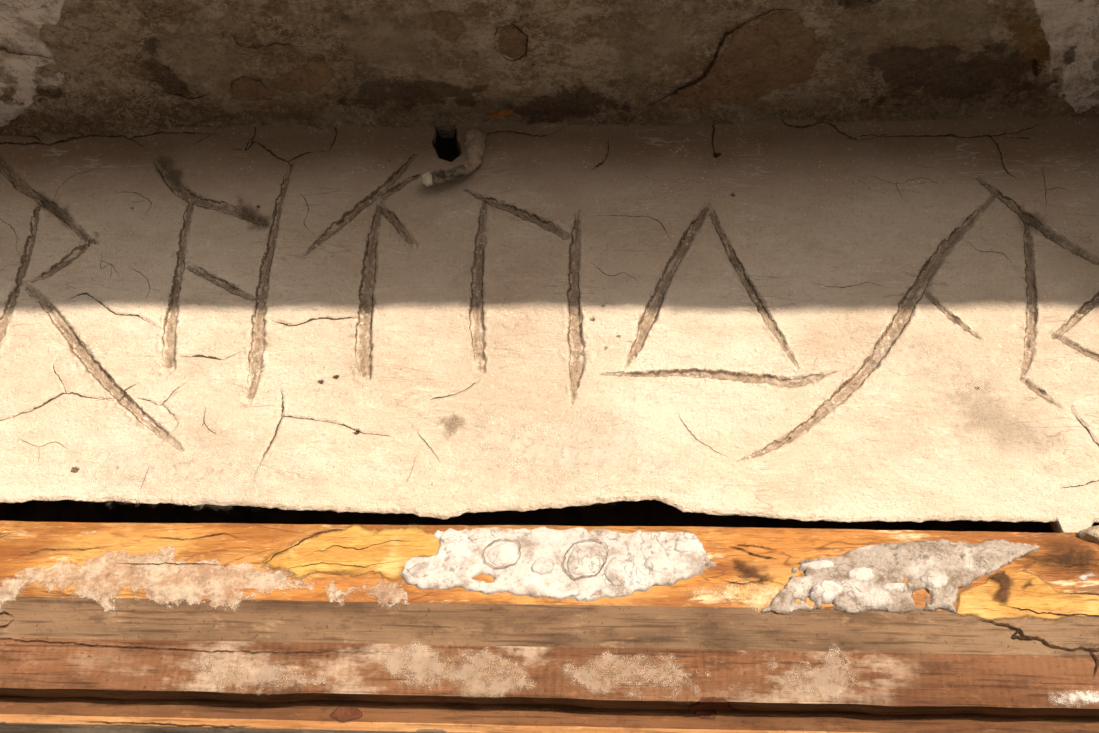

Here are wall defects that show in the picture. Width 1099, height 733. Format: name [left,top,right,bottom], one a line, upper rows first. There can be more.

crack [0,47,60,62]
peeling [0,0,71,127]
crack [652,9,792,105]
peeling [1034,0,1099,113]
crack [0,128,218,152]
crack [782,119,1047,178]
crack [69,252,158,328]
crack [272,317,352,326]
crack [0,349,244,461]
crack [253,391,386,477]
crack [678,412,725,456]
crack [978,593,1099,675]